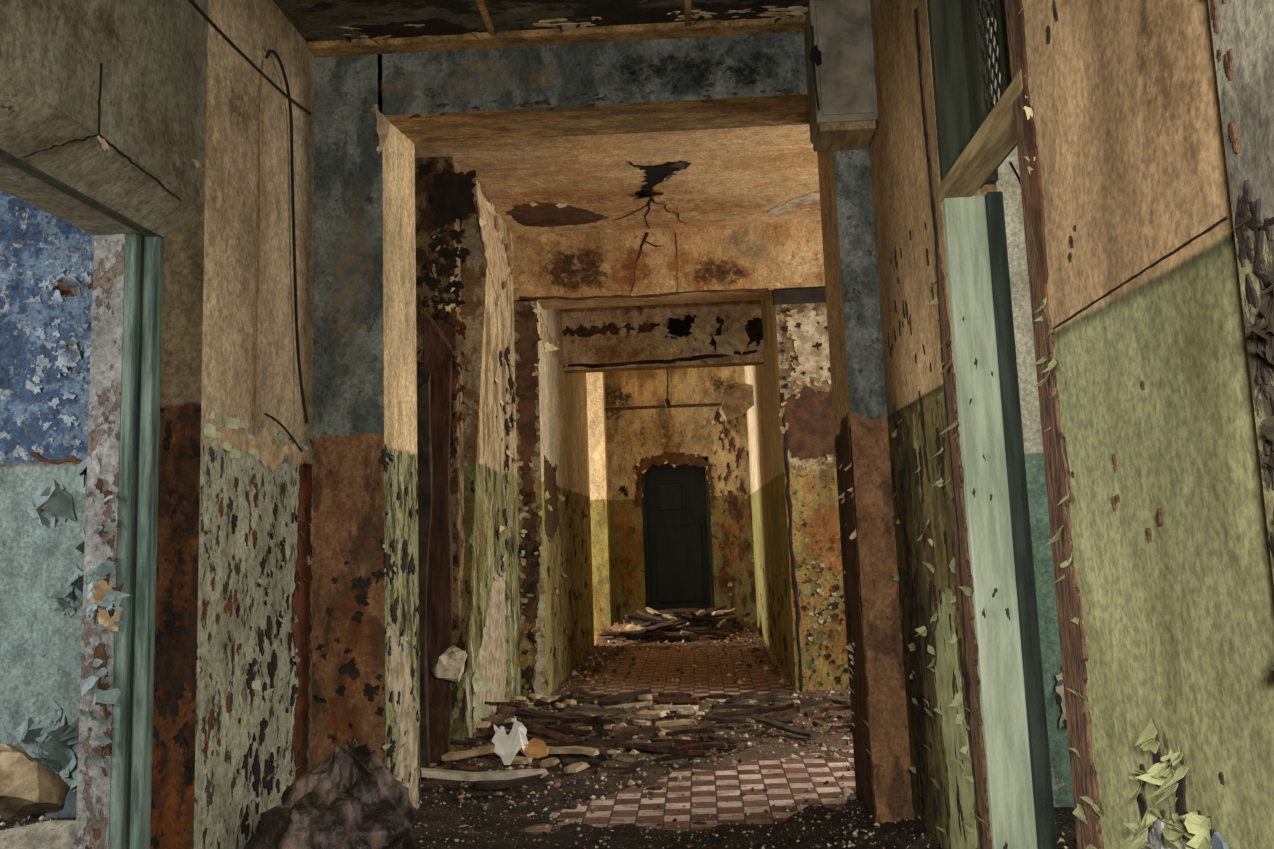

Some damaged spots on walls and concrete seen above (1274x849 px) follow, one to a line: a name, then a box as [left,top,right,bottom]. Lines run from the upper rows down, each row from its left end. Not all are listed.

spalling [372,104,391,155]
peeling [32,268,93,451]
spalling [425,169,609,434]
leakage [550,252,634,291]
leakage [697,261,744,283]
peeling [240,502,312,703]
spalling [313,538,422,809]
peeling [472,304,764,738]
spalling [618,308,877,818]
peeling [888,248,1008,849]
peeling [236,718,300,841]
spalling [1118,717,1229,849]